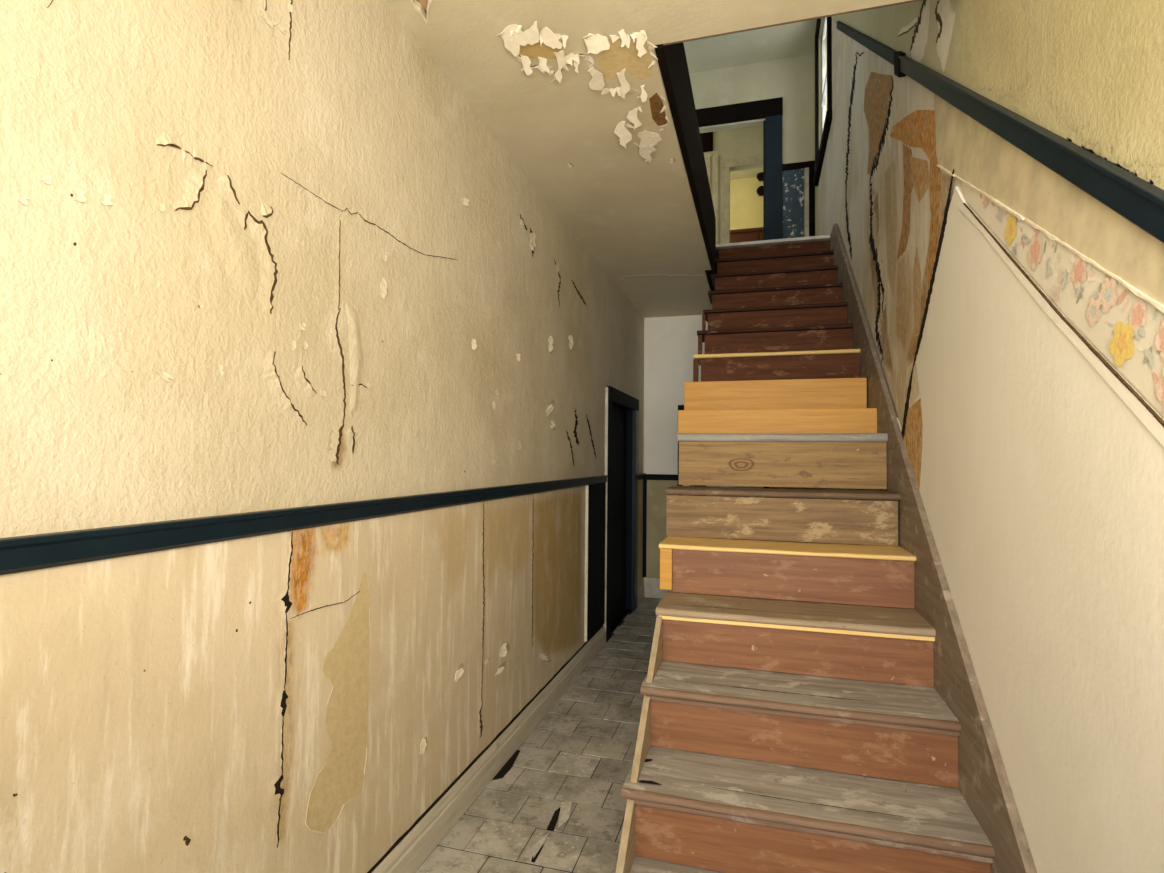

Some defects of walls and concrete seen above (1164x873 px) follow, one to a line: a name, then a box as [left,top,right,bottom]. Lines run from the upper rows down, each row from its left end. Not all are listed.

spalling [411,0,433,24]
peeling [497,21,672,163]
peeling [863,71,893,175]
crack [155,131,278,314]
crack [262,173,457,465]
peeling [903,361,923,489]
crack [268,532,360,848]
peeling [305,571,370,834]